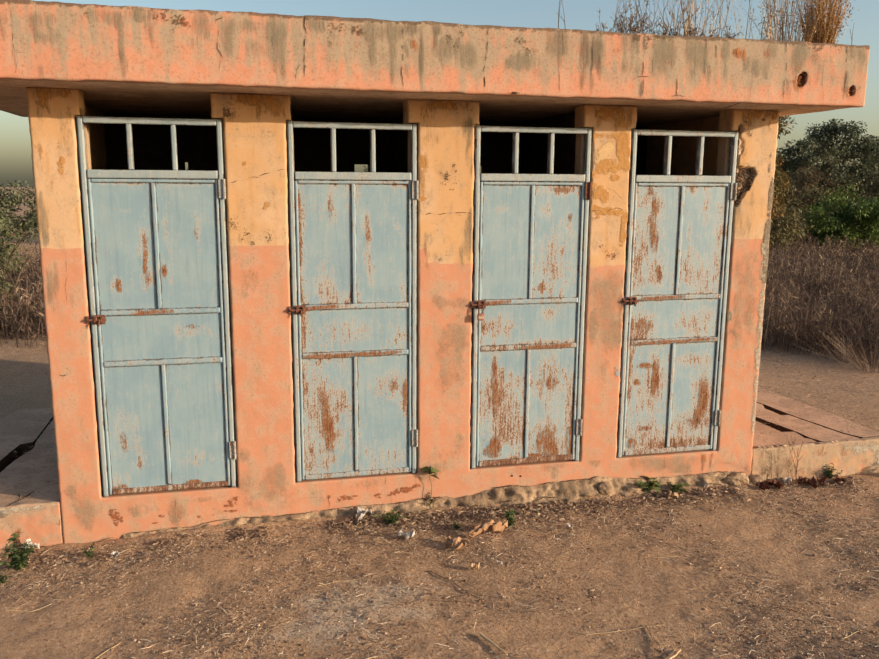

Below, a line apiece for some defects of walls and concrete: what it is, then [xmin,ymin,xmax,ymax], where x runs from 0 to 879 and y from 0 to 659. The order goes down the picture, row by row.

peeling [591,130,631,260]
rust [647,188,659,254]
spalling [734,124,756,206]
rust [301,304,339,342]
rust [319,387,336,453]
rust [302,350,405,369]
rust [390,380,408,405]
rust [483,435,502,458]
rust [491,356,500,418]
rust [523,426,573,457]
rust [628,318,718,398]
rust [682,379,709,426]